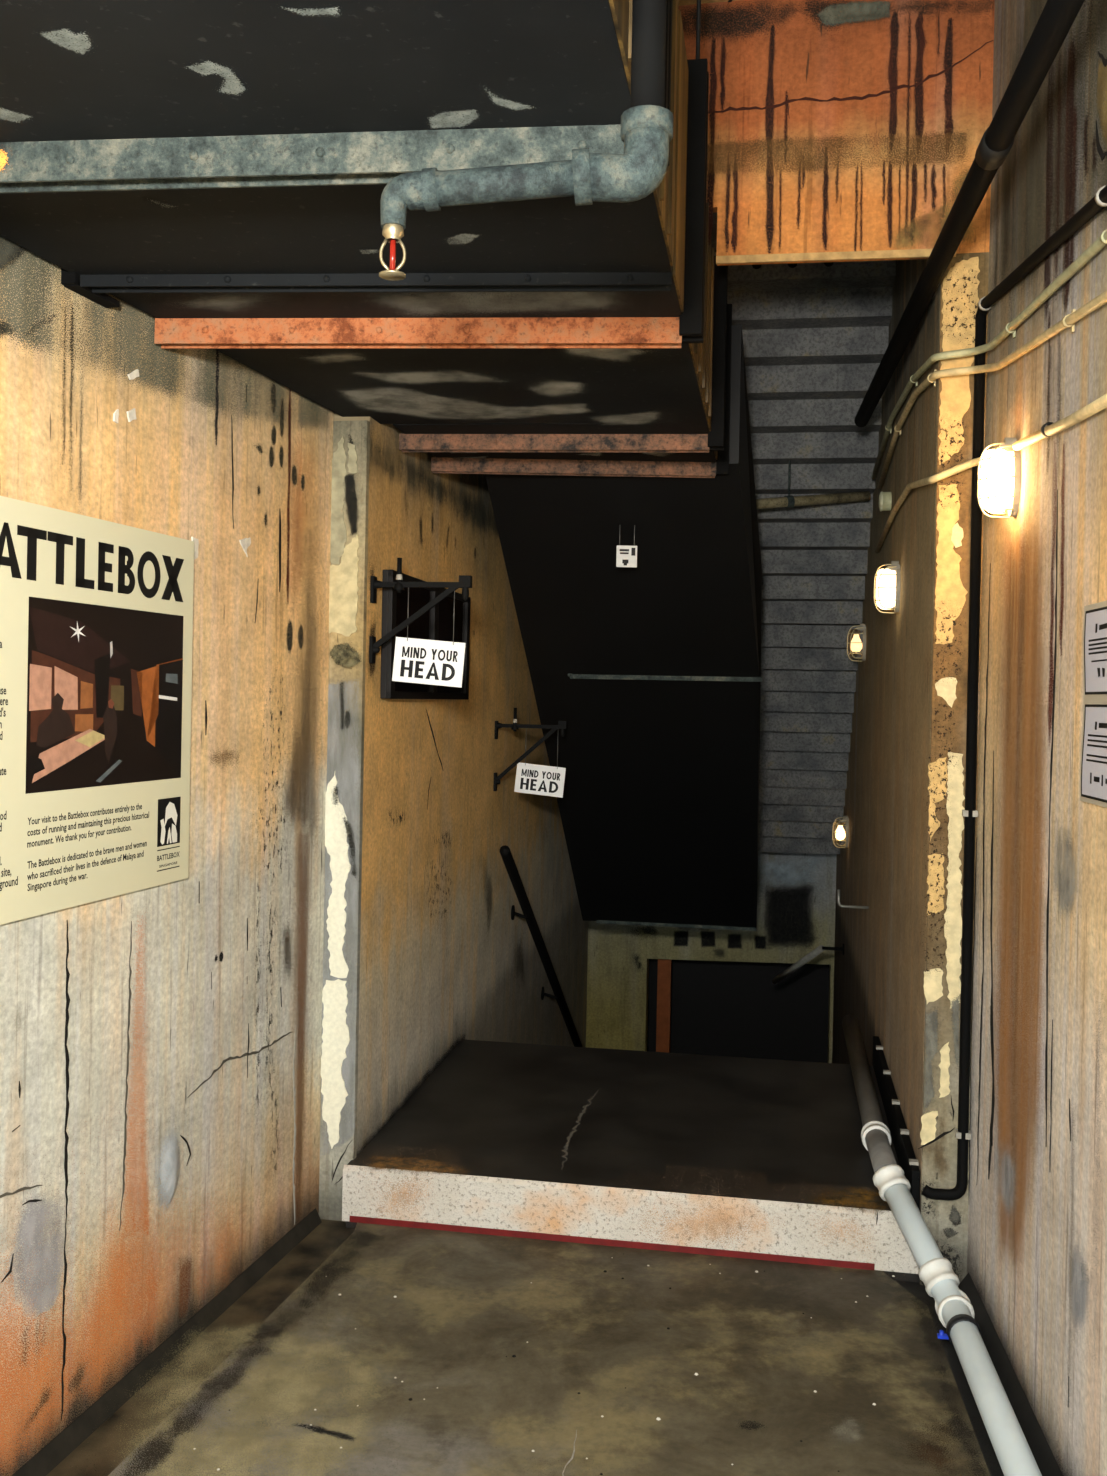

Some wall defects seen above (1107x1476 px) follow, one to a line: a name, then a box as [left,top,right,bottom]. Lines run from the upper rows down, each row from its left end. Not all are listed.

crack [562,1430,577,1476]